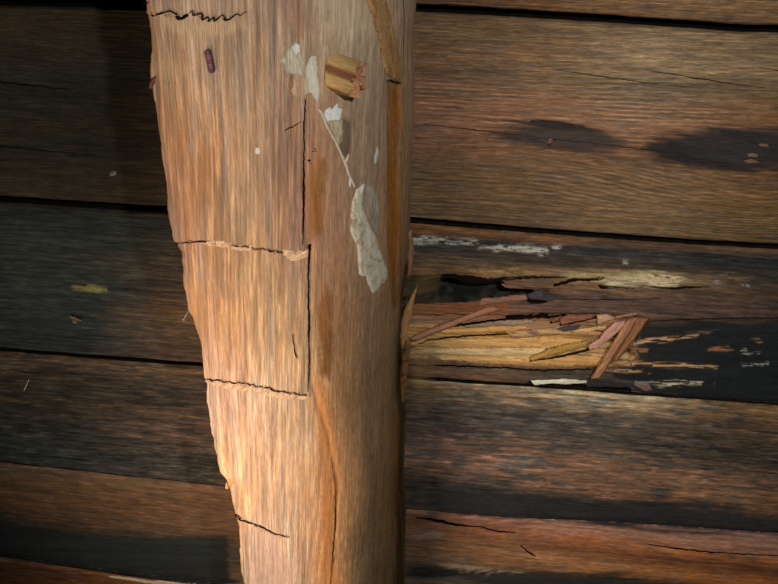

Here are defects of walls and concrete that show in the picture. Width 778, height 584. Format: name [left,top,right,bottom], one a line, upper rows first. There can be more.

crack [143,2,247,22]
damp [498,122,618,151]
damp [647,128,778,171]
peeling [281,43,387,294]
crack [174,99,311,396]
spalling [403,274,566,306]
peeling [505,312,638,339]
peeling [634,381,652,391]
crack [329,459,337,584]